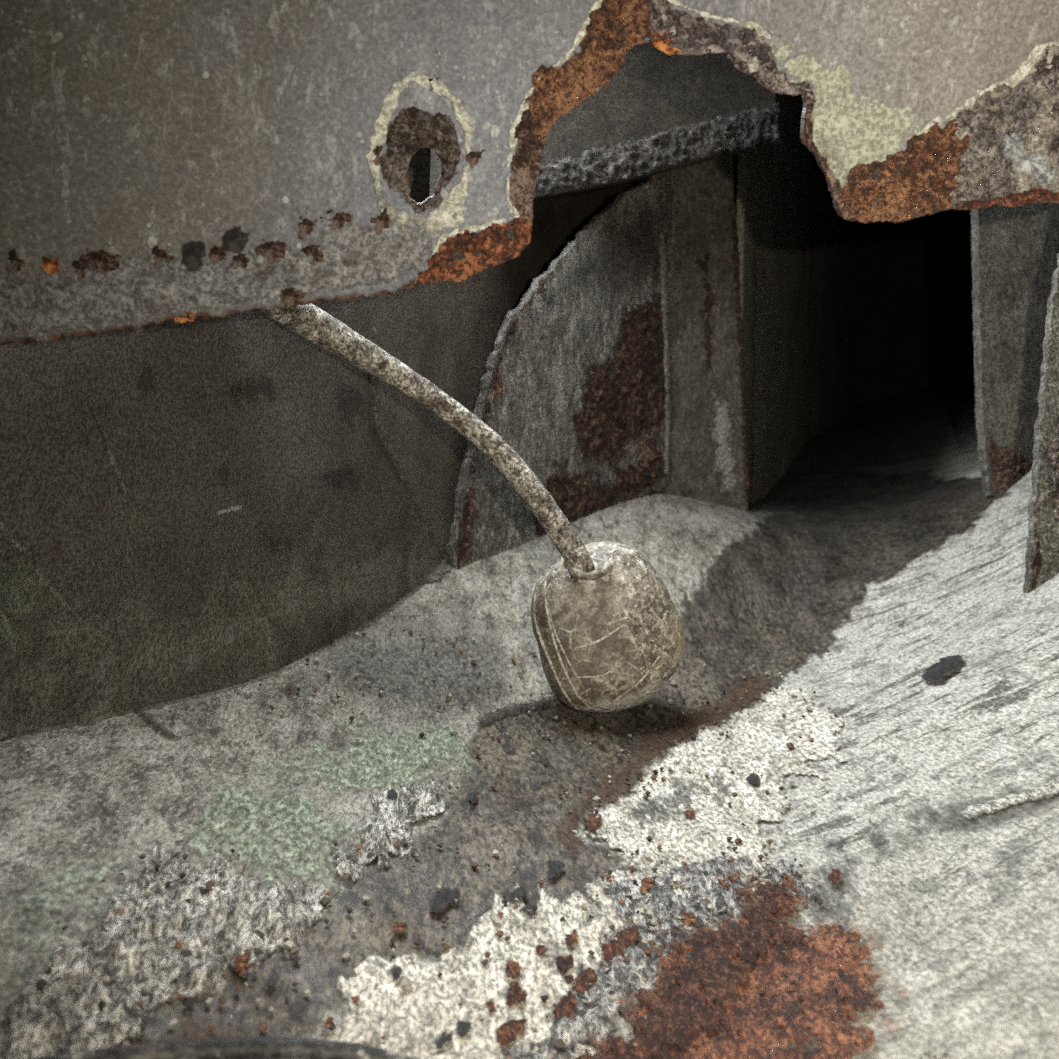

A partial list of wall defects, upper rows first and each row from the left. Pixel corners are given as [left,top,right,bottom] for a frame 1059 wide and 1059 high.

peeling [553,0,602,67]
peeling [667,0,1059,187]
peeling [365,51,540,257]
rust [695,254,715,369]
rust [545,292,670,521]
rust [987,438,1032,494]
rust [1044,423,1059,520]
water stain [114,470,1011,1047]
rust [509,886,527,904]
rust [536,929,598,1020]
rust [581,869,898,1059]